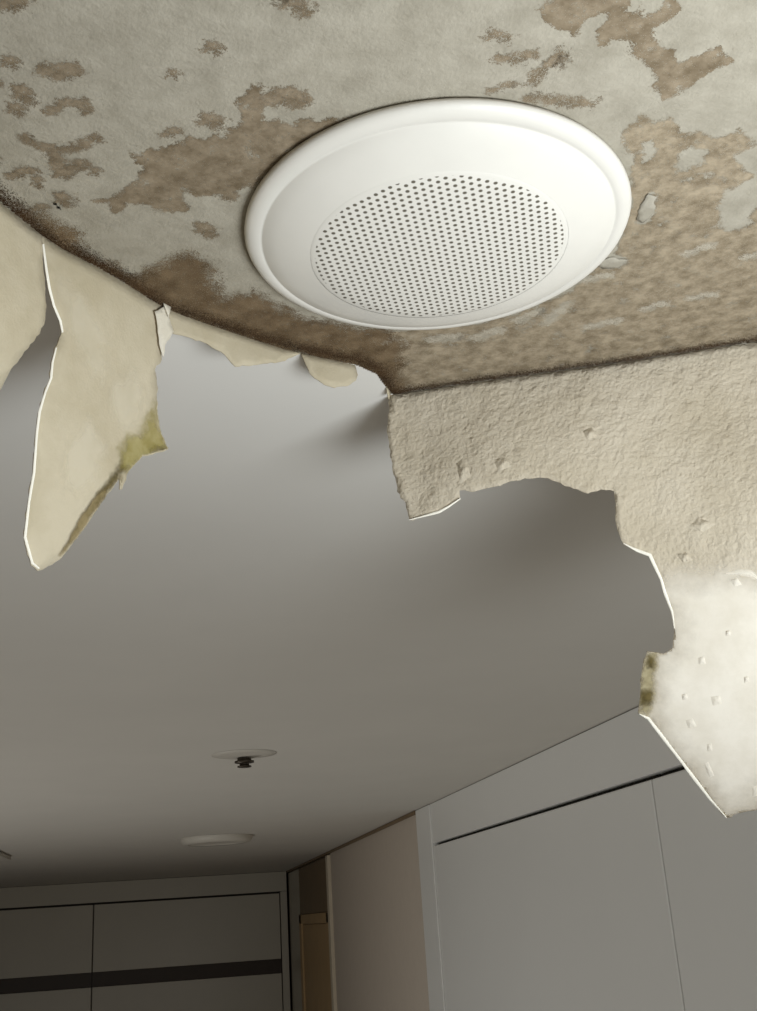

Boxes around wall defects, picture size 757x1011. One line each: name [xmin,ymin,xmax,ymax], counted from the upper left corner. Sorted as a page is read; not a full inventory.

peeling [195,39,231,60]
peeling [271,0,320,21]
peeling [0,52,349,241]
damp [0,185,757,395]
damp [61,412,166,553]